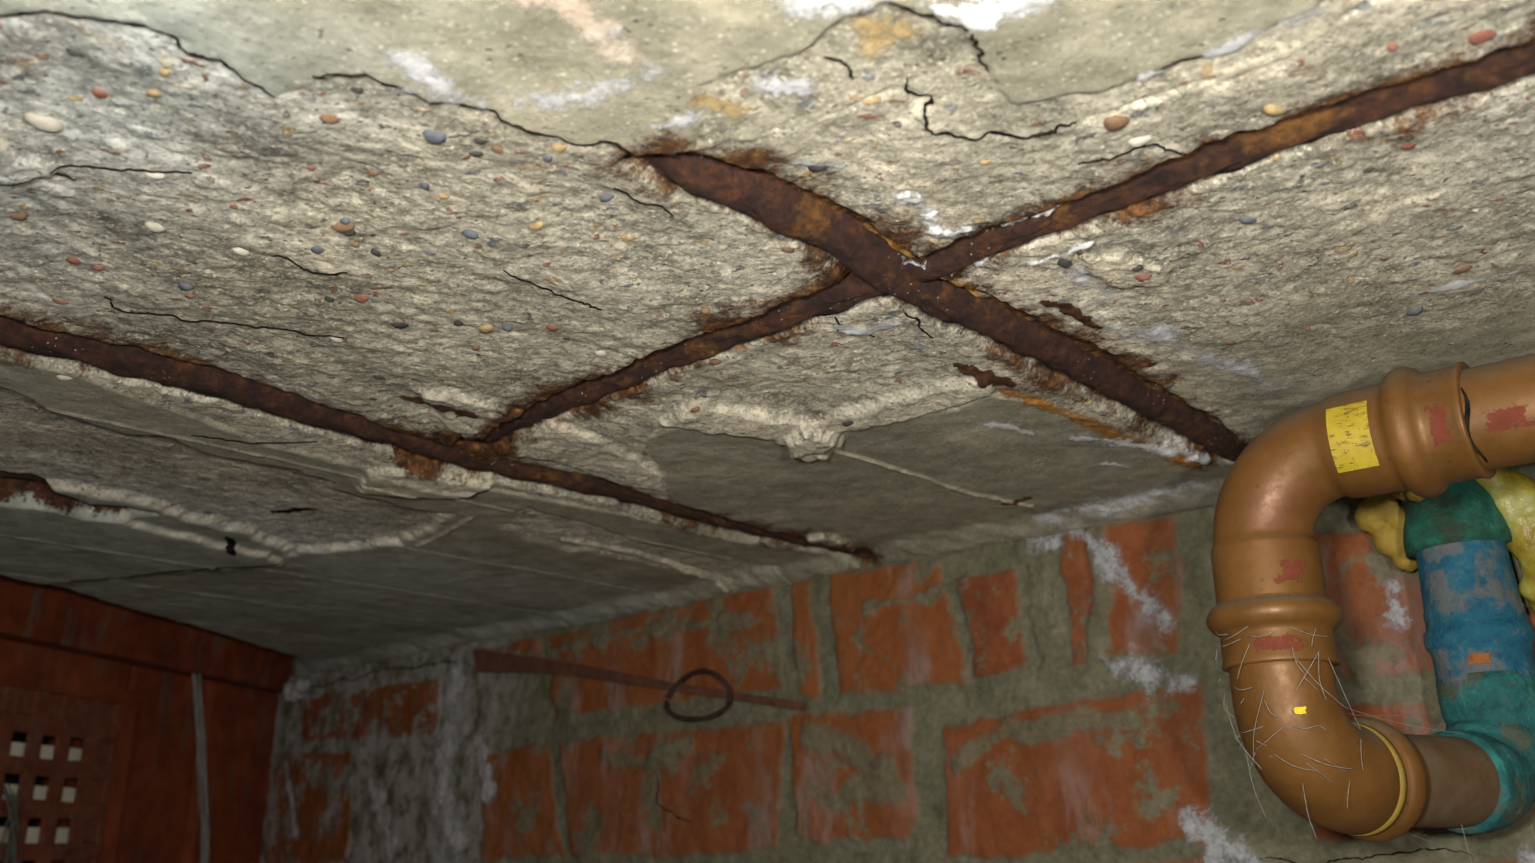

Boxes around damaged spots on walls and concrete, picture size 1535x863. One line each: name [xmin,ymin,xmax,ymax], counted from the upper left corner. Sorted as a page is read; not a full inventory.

crack [0,10,275,98]
damp [783,0,917,55]
crack [888,2,990,74]
damp [922,0,1053,33]
crack [6,165,192,186]
crack [312,73,673,217]
corrosion [595,129,1226,263]
crack [904,78,1077,141]
spalling [0,0,1535,586]
corrosion [0,219,854,486]
corrosion [876,246,1250,472]
corrosion [0,477,129,517]